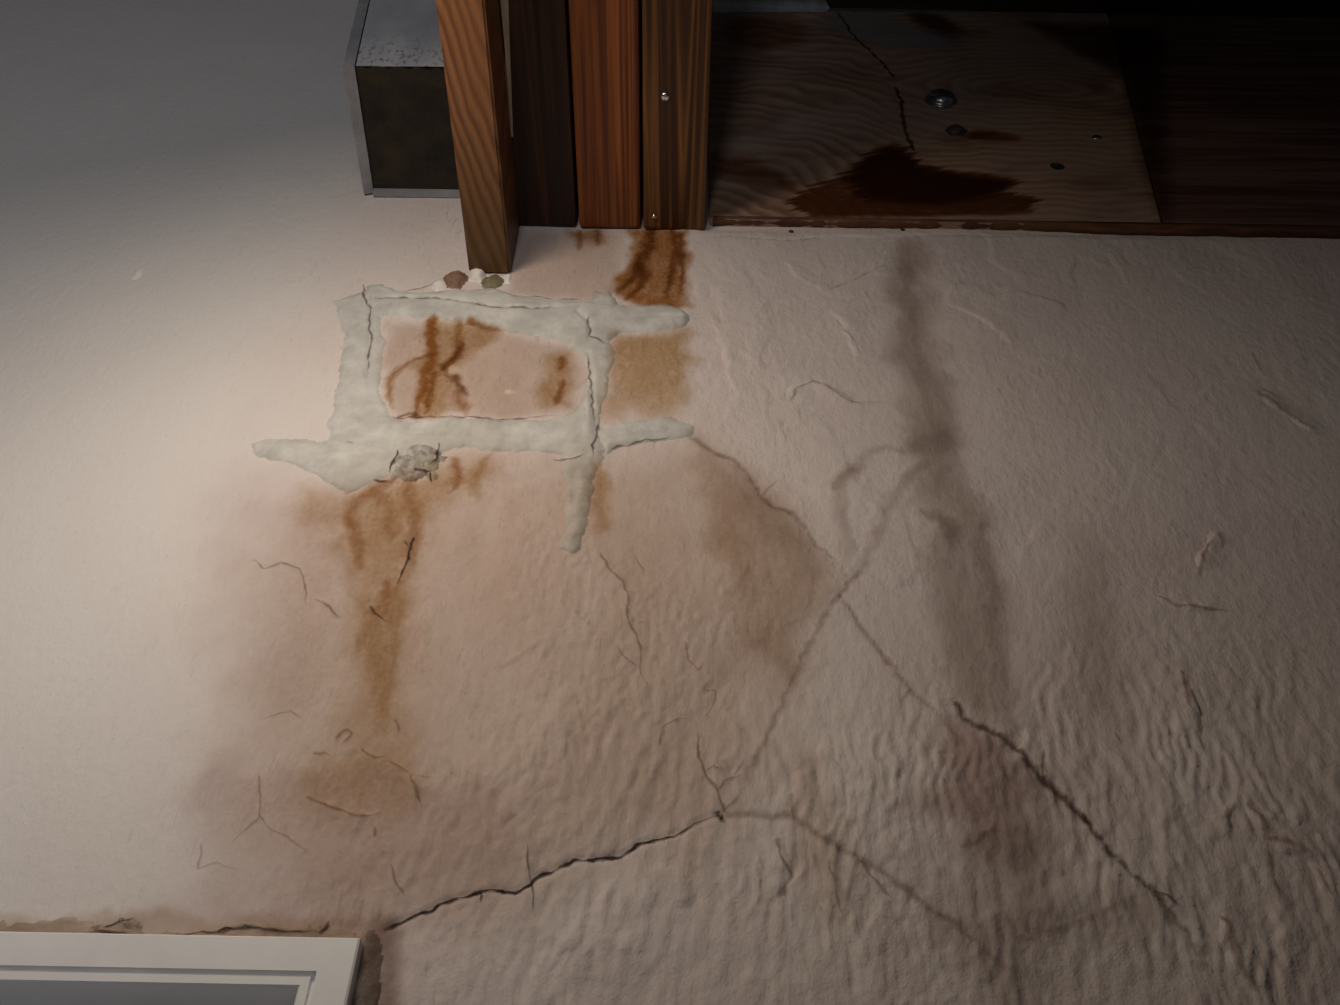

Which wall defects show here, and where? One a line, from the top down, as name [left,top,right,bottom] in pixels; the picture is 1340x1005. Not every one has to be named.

water stain [787,146,1037,215]
spalling [431,268,513,292]
spalling [445,365,462,374]
spalling [390,444,448,482]
crack [390,817,722,927]
spalling [0,917,144,934]
spalling [161,922,366,947]